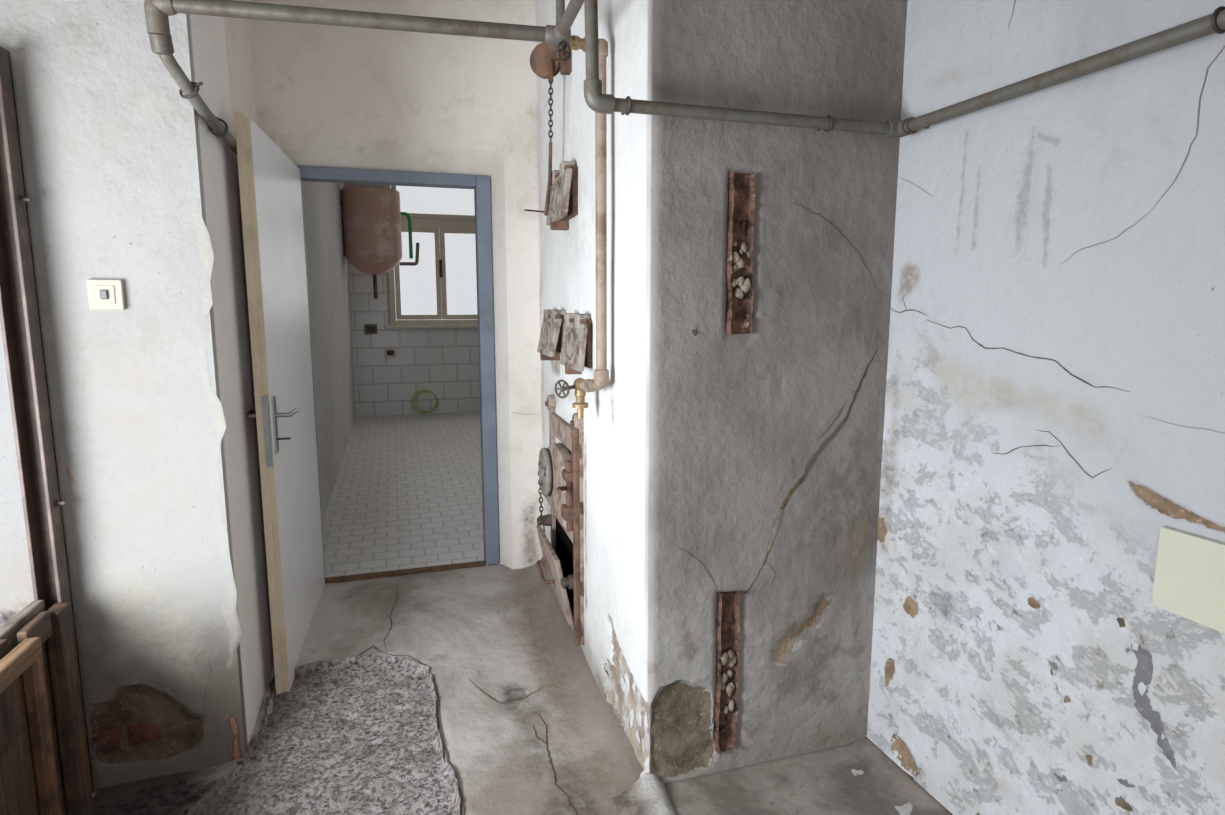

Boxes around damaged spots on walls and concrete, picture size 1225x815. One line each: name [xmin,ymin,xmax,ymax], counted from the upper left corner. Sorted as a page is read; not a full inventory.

crack [1063,46,1225,263]
crack [792,202,1129,392]
crack [675,348,878,593]
crack [996,430,1112,478]
flaking render [1126,476,1225,533]
damp [0,586,34,628]
flaking render [88,683,205,766]
crack [436,702,465,815]
peeling [602,557,717,781]
peeling [745,570,862,738]
flaking render [889,733,920,777]
peeling [1125,643,1183,777]